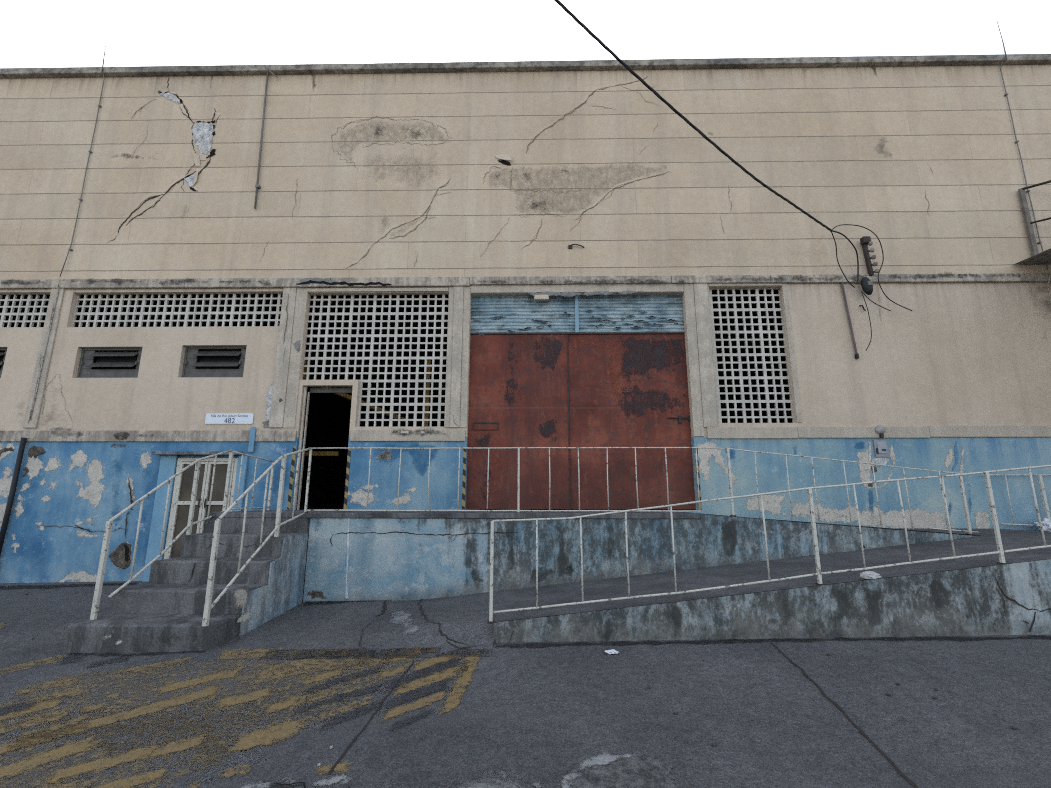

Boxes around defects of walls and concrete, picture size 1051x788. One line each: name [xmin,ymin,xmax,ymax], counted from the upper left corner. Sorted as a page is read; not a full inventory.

crack [110,78,220,241]
flaking render [184,120,216,191]
crack [523,74,671,232]
crack [344,177,451,269]
peeling [0,443,105,538]
peeling [59,570,97,582]
flaking render [109,477,135,569]
crack [330,531,520,546]
water stain [530,543,573,582]
water stain [722,520,737,555]
peeling [746,494,953,529]
water stain [672,607,681,635]